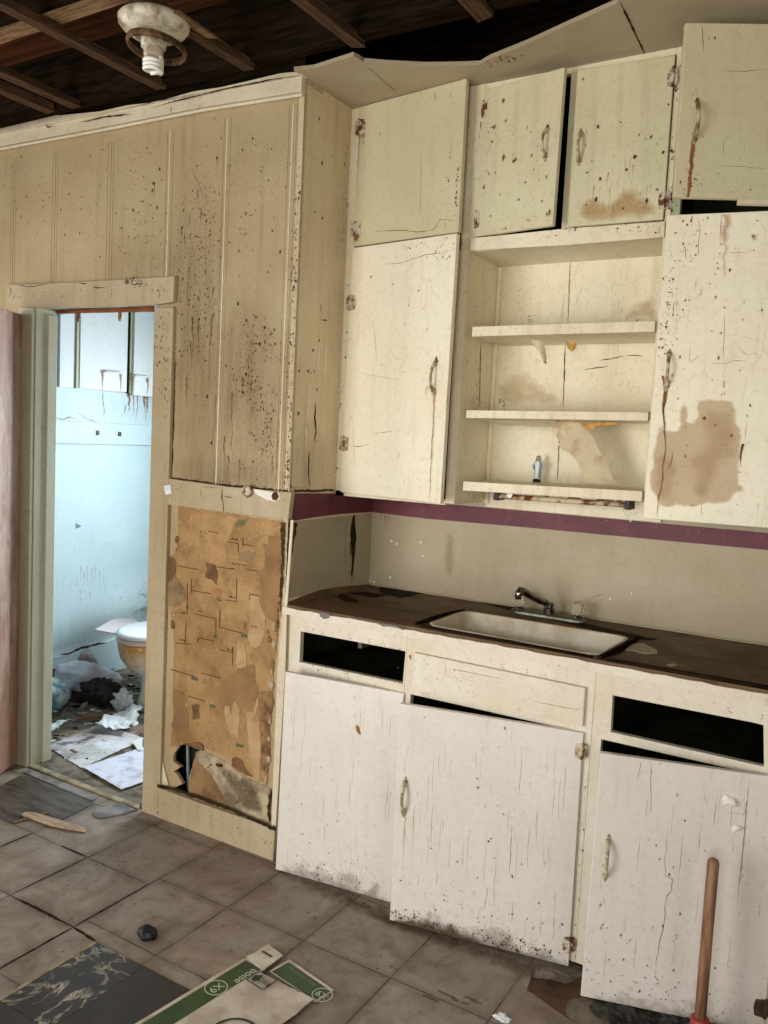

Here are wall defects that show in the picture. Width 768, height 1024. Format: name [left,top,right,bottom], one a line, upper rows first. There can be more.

crack [620,3,645,54]
crack [348,515,356,578]
flaking render [195,622,276,823]